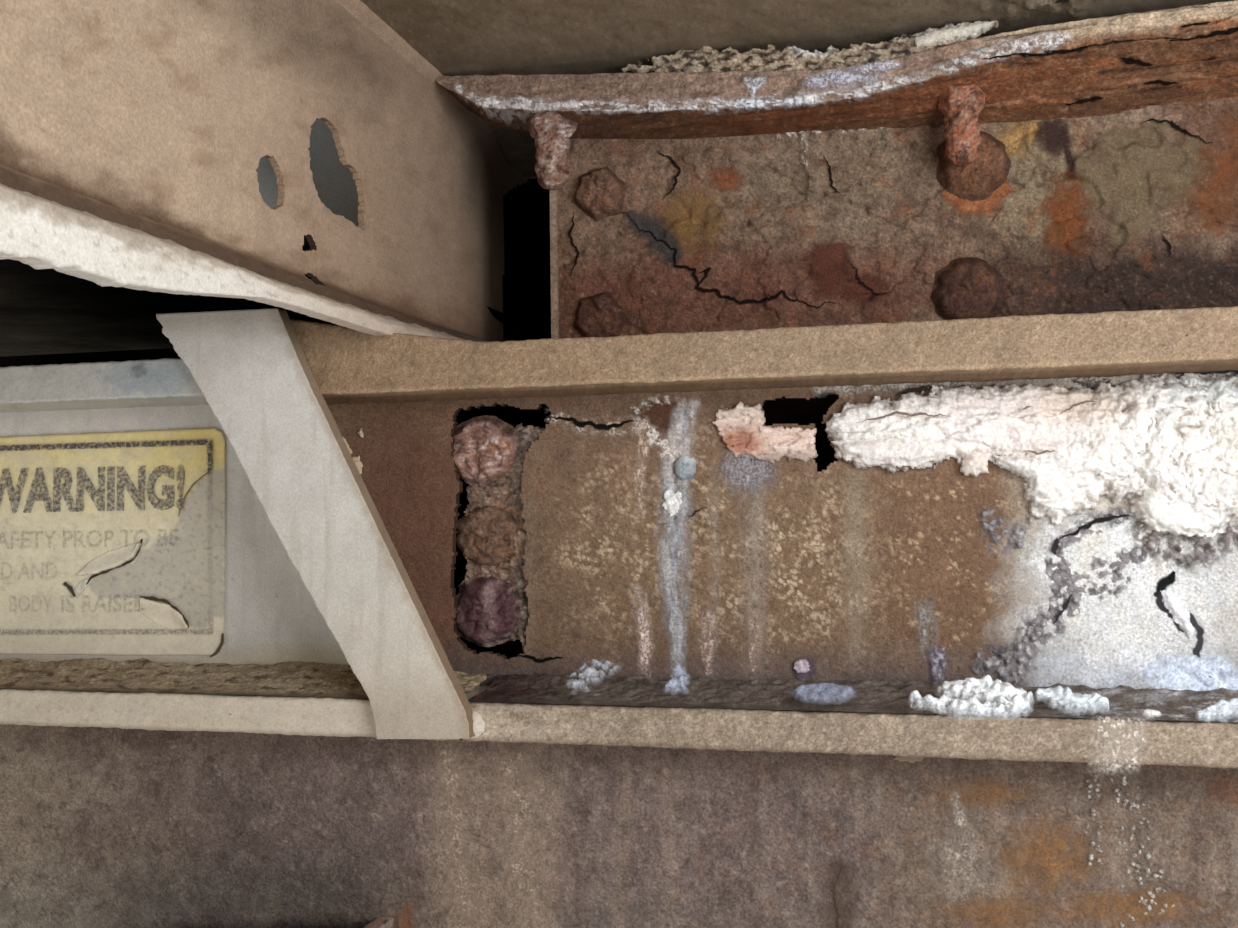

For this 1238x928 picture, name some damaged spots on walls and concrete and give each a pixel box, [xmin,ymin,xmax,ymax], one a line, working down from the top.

spalling [969,0,1089,21]
corrosion [621,20,998,73]
crack [983,22,1238,85]
corrosion [999,123,1042,156]
corrosion [942,180,1013,214]
peeling [631,395,699,433]
spalling [712,402,818,494]
efflorescence [633,402,703,690]
crack [1051,515,1133,555]
crack [1154,571,1212,678]
leakage [566,659,618,689]
leakage [793,658,854,701]